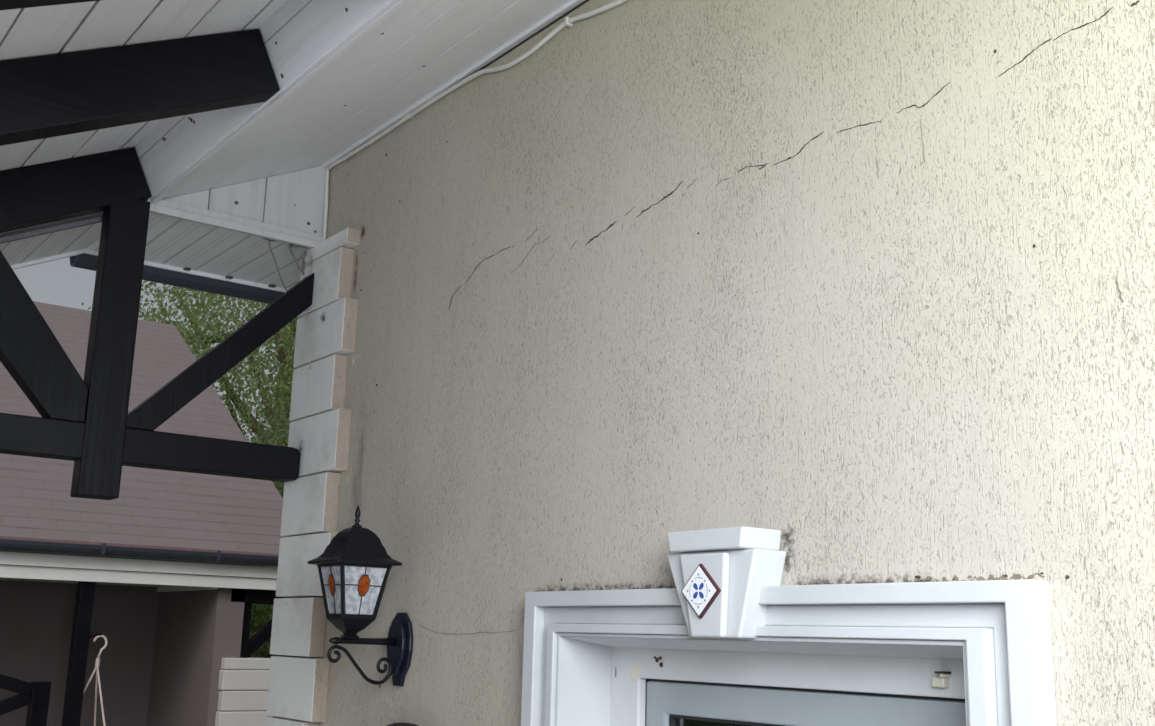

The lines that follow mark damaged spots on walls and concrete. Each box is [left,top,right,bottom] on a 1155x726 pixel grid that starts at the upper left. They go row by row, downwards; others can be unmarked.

crack [999,1,1140,76]
crack [449,82,950,309]